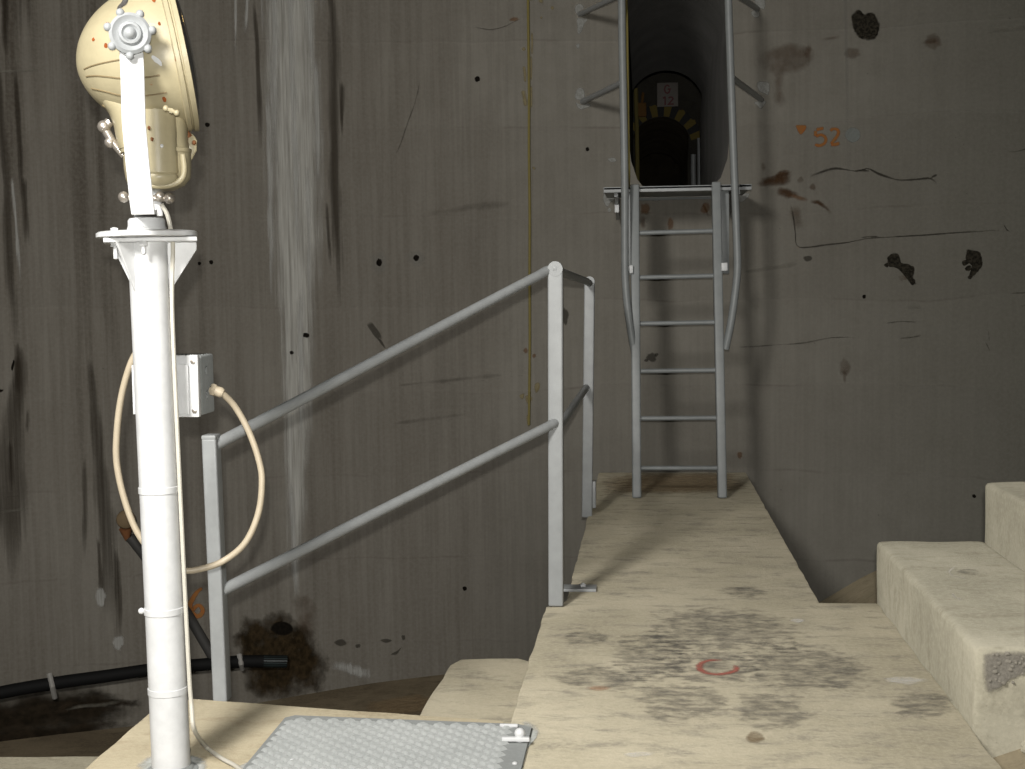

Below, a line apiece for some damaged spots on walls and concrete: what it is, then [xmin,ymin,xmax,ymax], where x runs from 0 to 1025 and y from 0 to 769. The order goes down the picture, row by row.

rust [764,171,792,197]
crack [820,168,936,181]
crack [793,217,966,248]
water stain [234,0,343,580]
water stain [237,615,322,695]
spalling [984,651,1025,691]